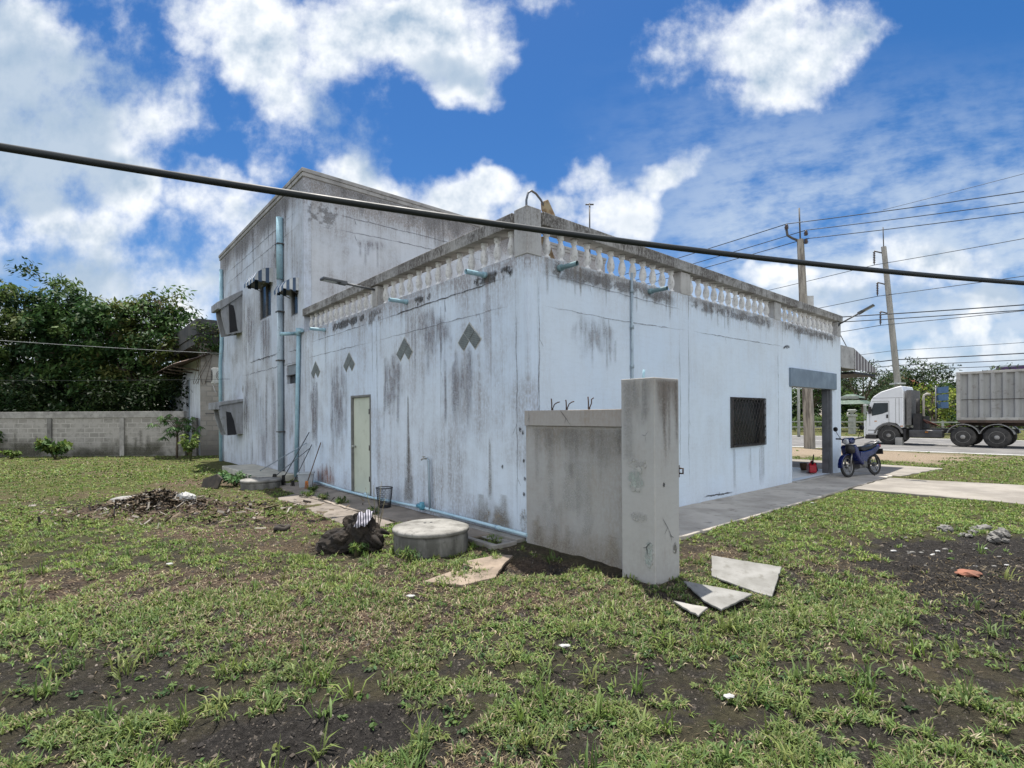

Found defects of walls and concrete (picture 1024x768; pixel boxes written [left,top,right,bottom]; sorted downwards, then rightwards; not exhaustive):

damp [484,510,509,528]